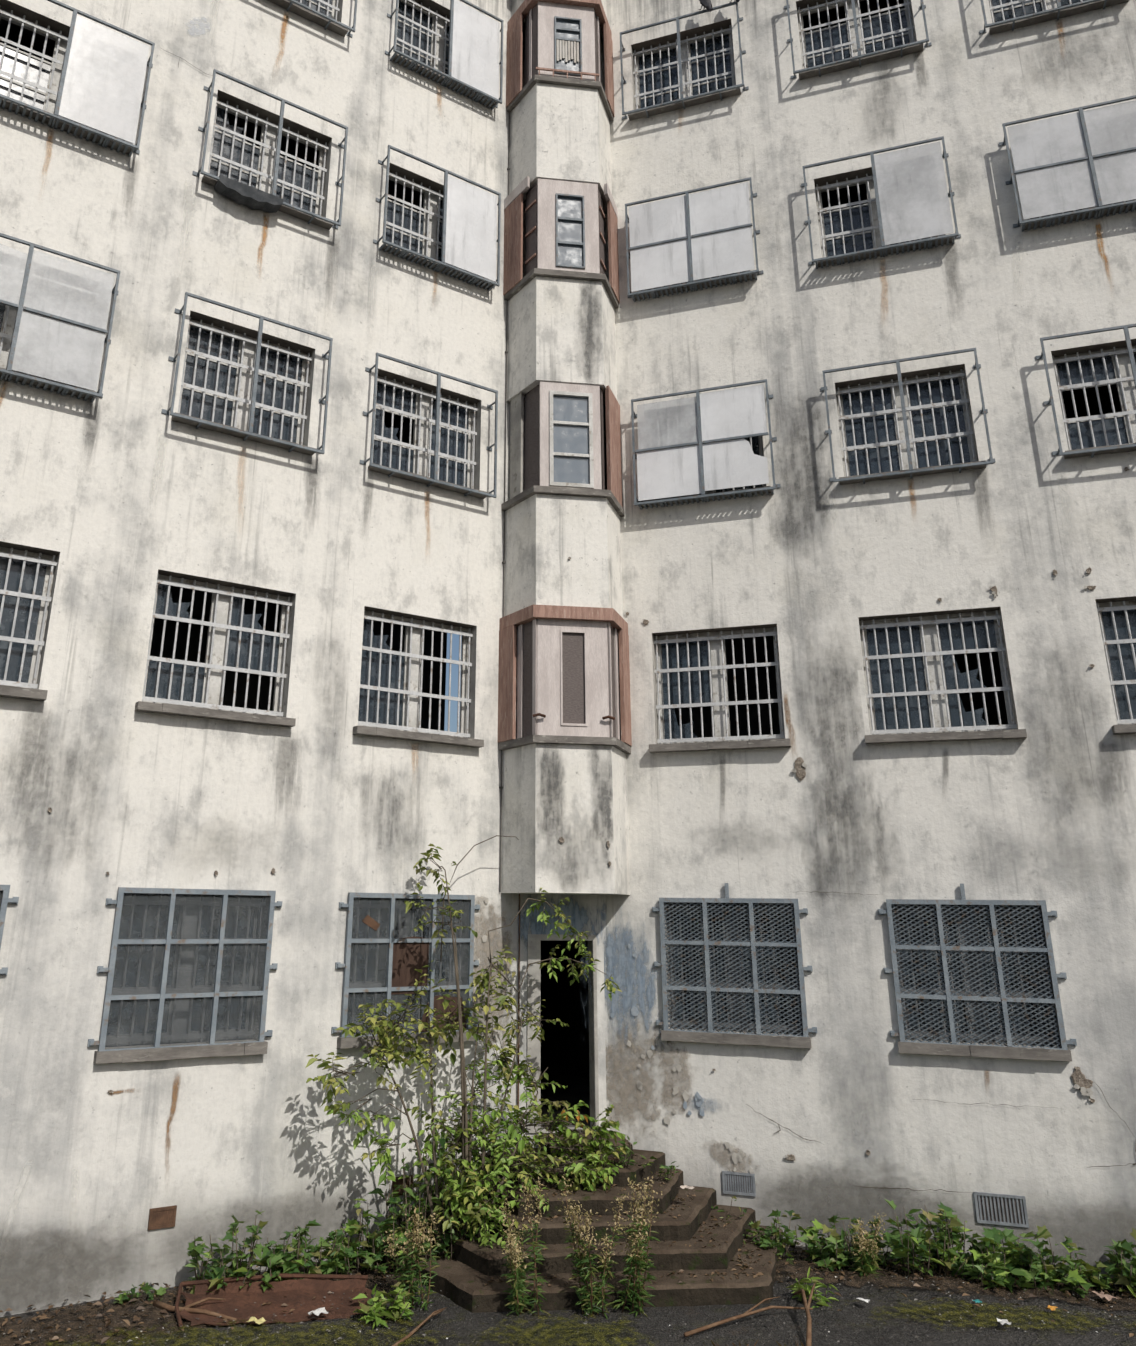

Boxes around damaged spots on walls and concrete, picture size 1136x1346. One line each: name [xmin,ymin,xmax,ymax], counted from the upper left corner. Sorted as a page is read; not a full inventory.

corrosion [1096,224,1108,269]
leakage [777,424,827,537]
leakage [541,752,563,827]
leakage [593,749,613,833]
leakage [814,792,857,896]
corrosion [167,1079,179,1148]
crack [746,1104,824,1145]
spalling [1071,1066,1095,1103]
crack [1087,1084,1136,1168]